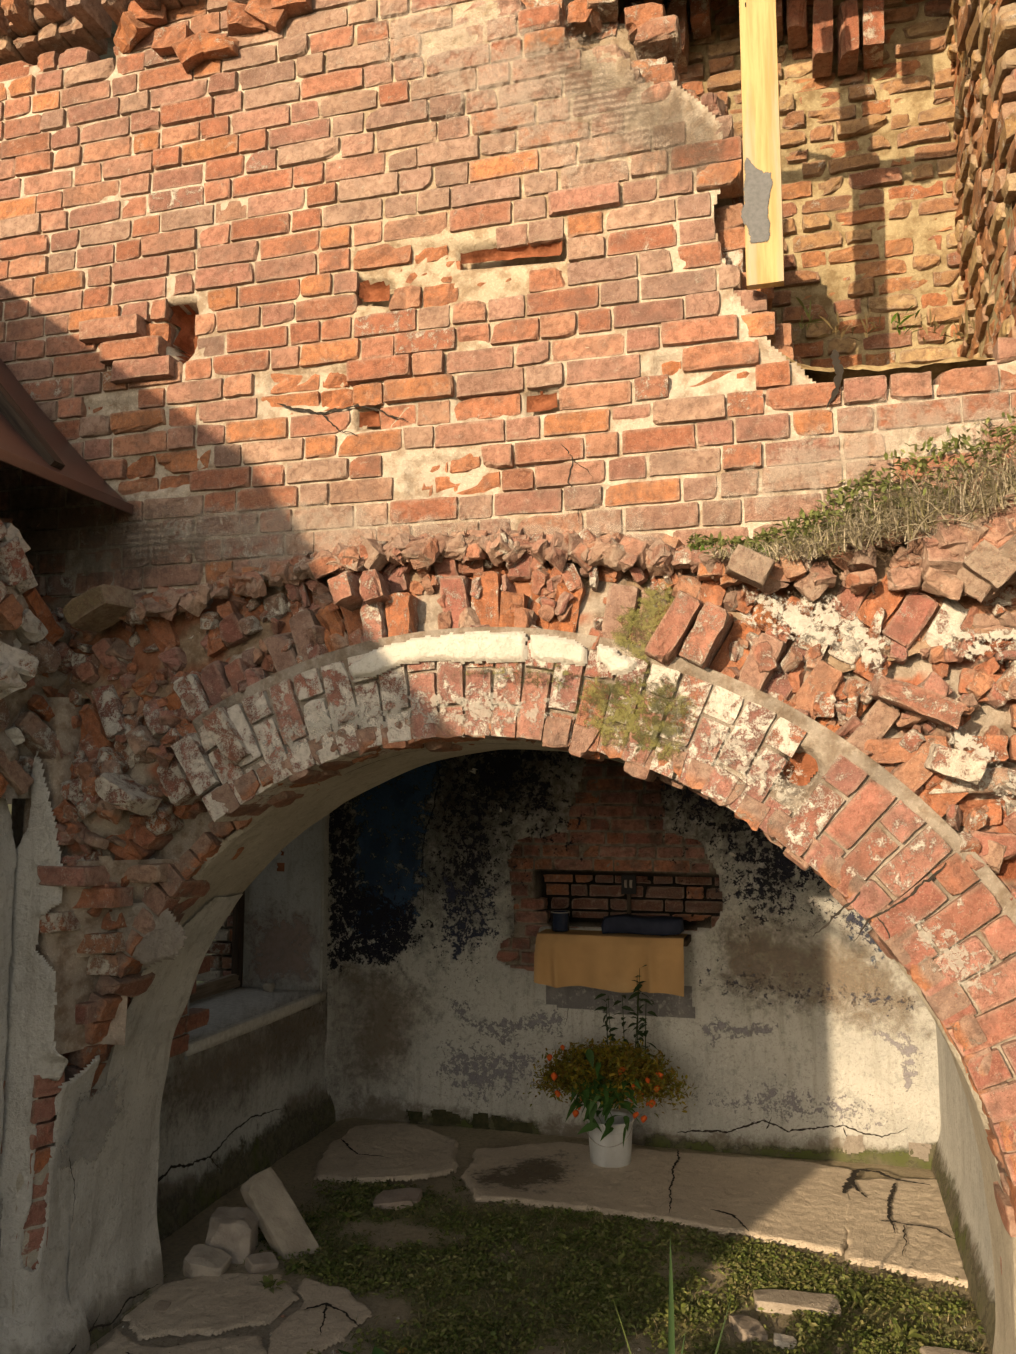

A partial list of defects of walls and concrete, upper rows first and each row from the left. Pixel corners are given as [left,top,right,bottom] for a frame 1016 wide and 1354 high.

spalling [79,405,166,438]
spalling [118,449,211,495]
spalling [422,443,534,496]
spalling [0,518,1016,976]
peeling [326,749,915,1134]
damp [721,921,913,1023]
flaking render [16,1052,76,1270]
crack [158,1109,280,1182]
crack [668,1117,907,1213]
crack [711,1209,749,1231]
crack [842,1169,956,1255]